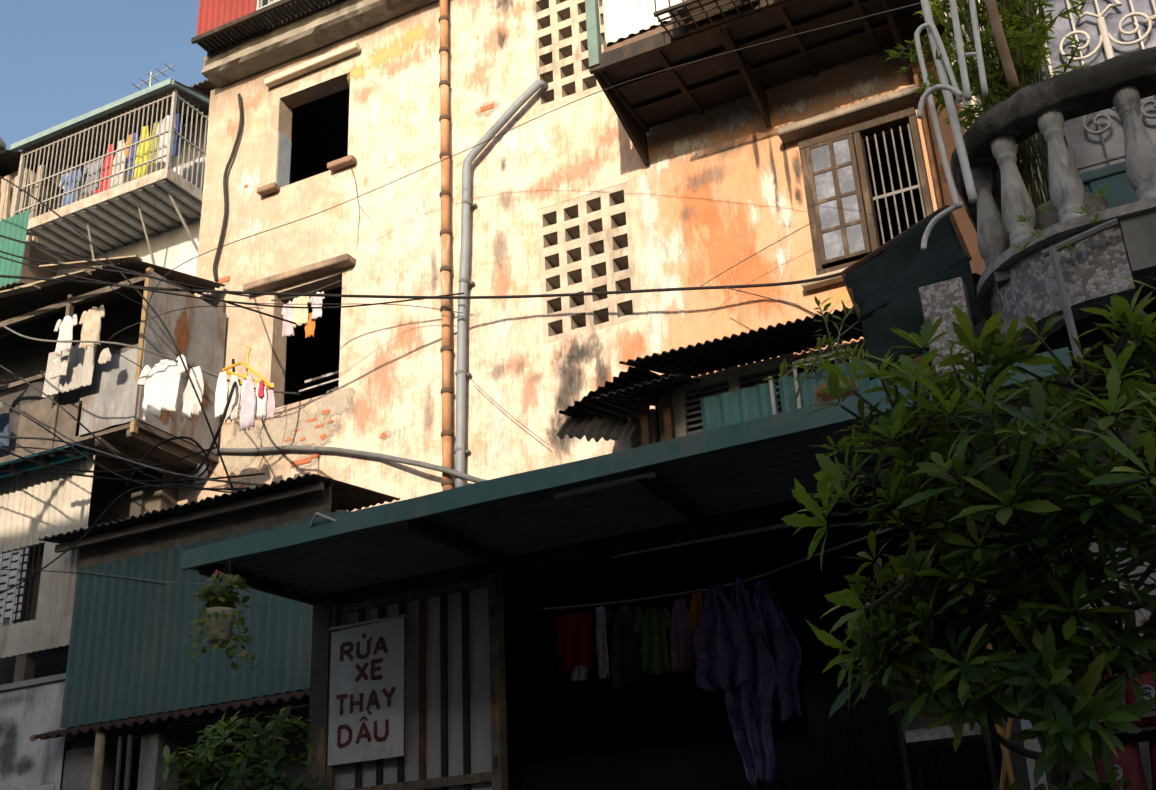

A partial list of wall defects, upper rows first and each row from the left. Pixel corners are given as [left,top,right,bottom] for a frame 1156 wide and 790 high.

flaking render [474,100,500,117]
water stain [753,134,802,227]
peeling [218,350,396,492]
water stain [547,334,607,451]
water stain [0,722,30,774]